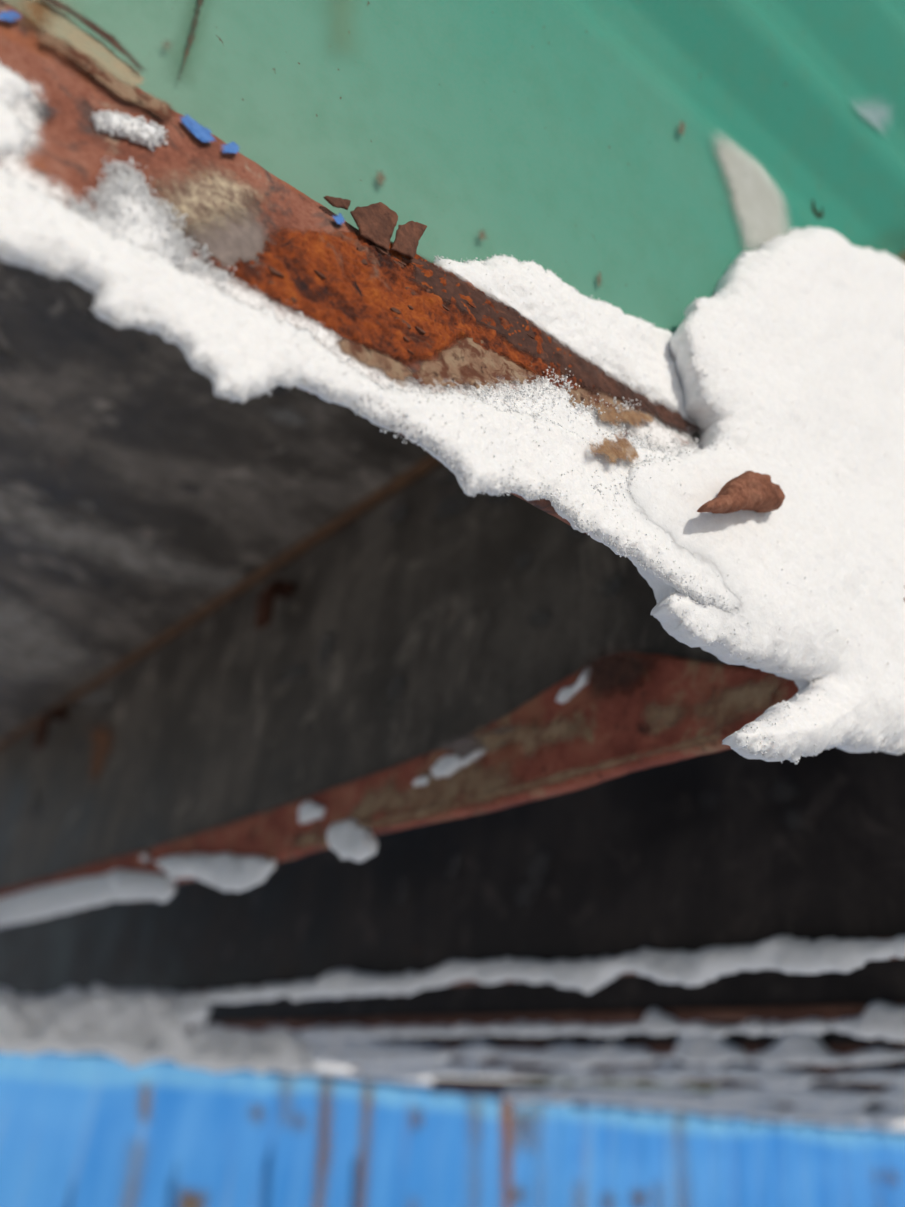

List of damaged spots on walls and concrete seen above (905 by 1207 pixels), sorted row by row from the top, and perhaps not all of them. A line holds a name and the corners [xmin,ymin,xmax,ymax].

rust [191,196,700,431]
rust [585,652,648,694]
rust [180,1192,204,1207]
rust [315,1079,331,1207]
rust [357,1085,371,1207]
rust [501,1099,521,1207]